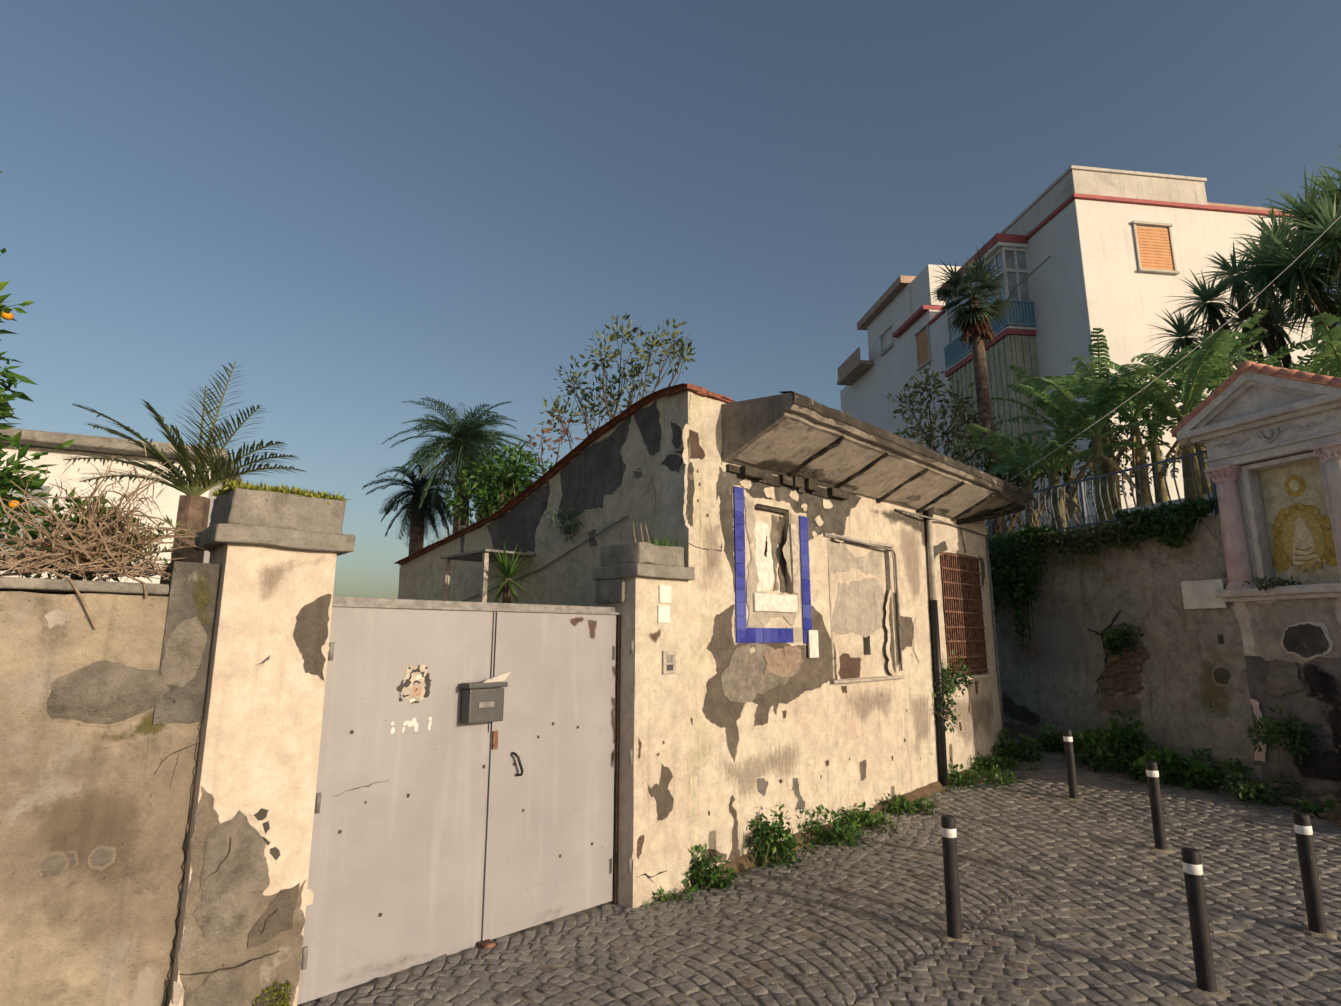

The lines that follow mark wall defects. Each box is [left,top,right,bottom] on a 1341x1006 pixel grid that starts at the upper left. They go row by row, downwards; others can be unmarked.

peeling [254,653,273,667]
peeling [285,588,332,683]
peeling [485,399,864,767]
peeling [1265,621,1341,710]
peeling [632,736,675,863]
peeling [169,784,314,1006]